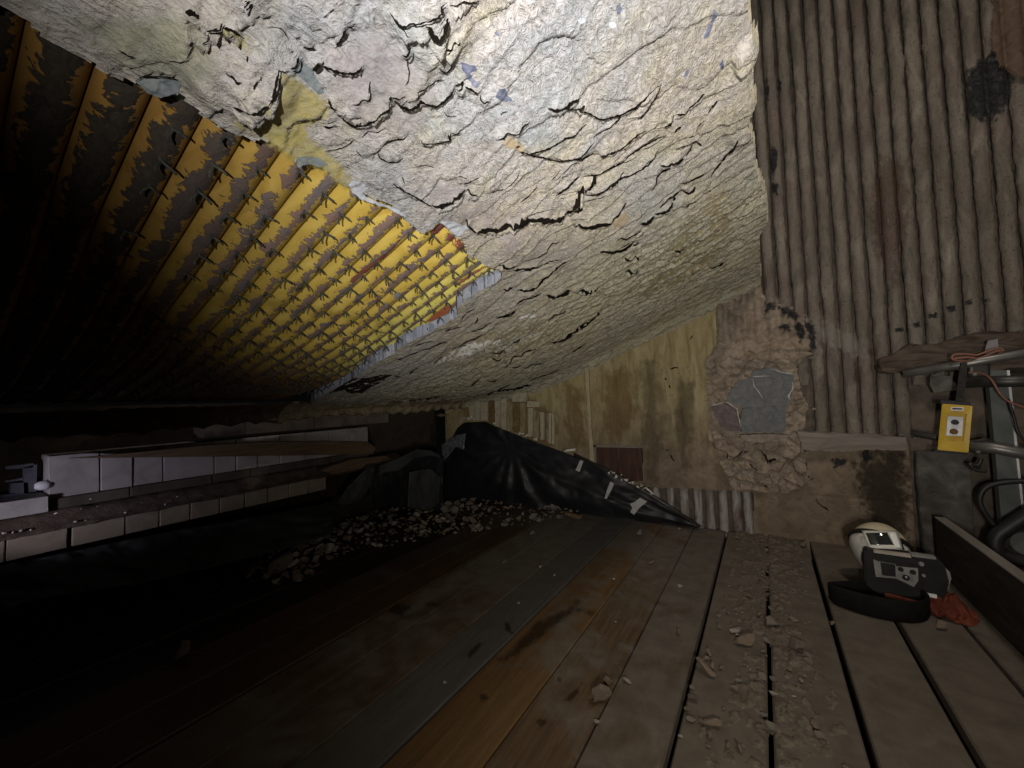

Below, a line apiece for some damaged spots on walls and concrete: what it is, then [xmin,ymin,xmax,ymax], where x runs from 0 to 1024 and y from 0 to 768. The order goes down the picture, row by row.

spalling [744,0,759,49]
spalling [135,77,185,100]
spalling [290,60,324,95]
spalling [461,62,479,88]
spalling [284,147,335,181]
spalling [748,121,768,221]
spalling [349,180,426,233]
crack [185,1,738,402]
spalling [440,221,469,256]
spalling [309,269,503,405]
spalling [704,264,818,493]